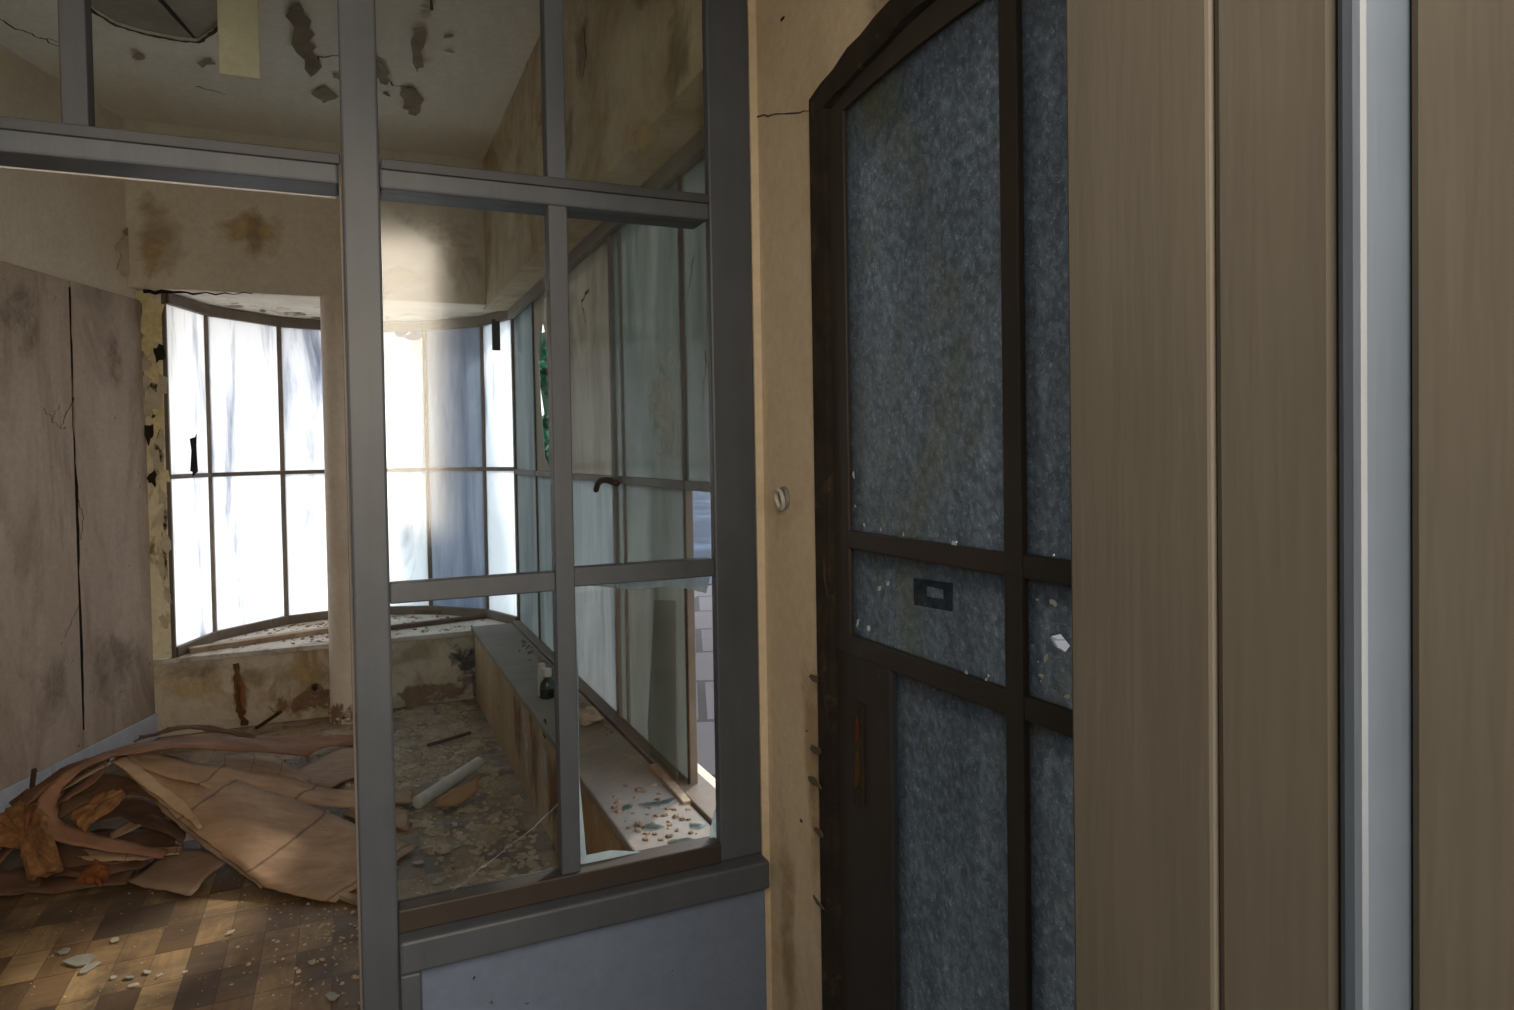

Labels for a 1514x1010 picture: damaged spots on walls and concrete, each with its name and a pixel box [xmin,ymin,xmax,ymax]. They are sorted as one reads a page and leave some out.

flaking render [91,0,218,68]
peeling [285,3,339,103]
peeling [377,28,426,116]
flaking render [271,683,353,723]
flaking render [398,676,475,707]